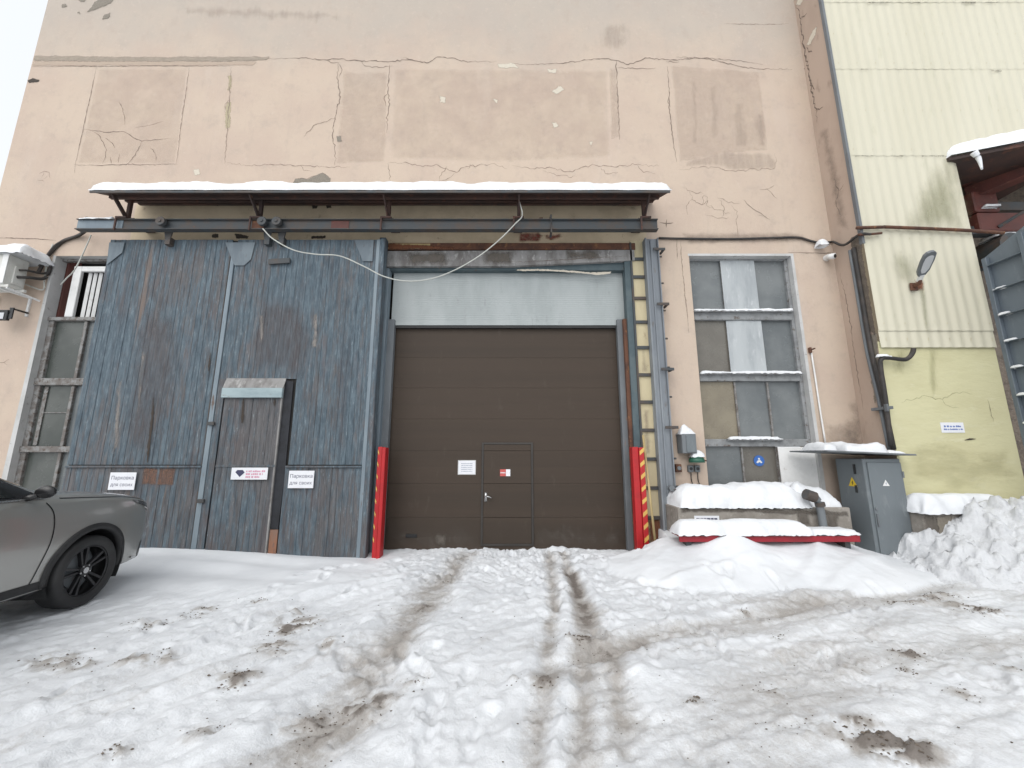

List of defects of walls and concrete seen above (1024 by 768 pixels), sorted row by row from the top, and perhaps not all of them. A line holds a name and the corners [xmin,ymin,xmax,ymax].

peeling [62,0,113,19]
crack [35,65,189,166]
spalling [293,173,330,183]
crack [225,8,822,331]